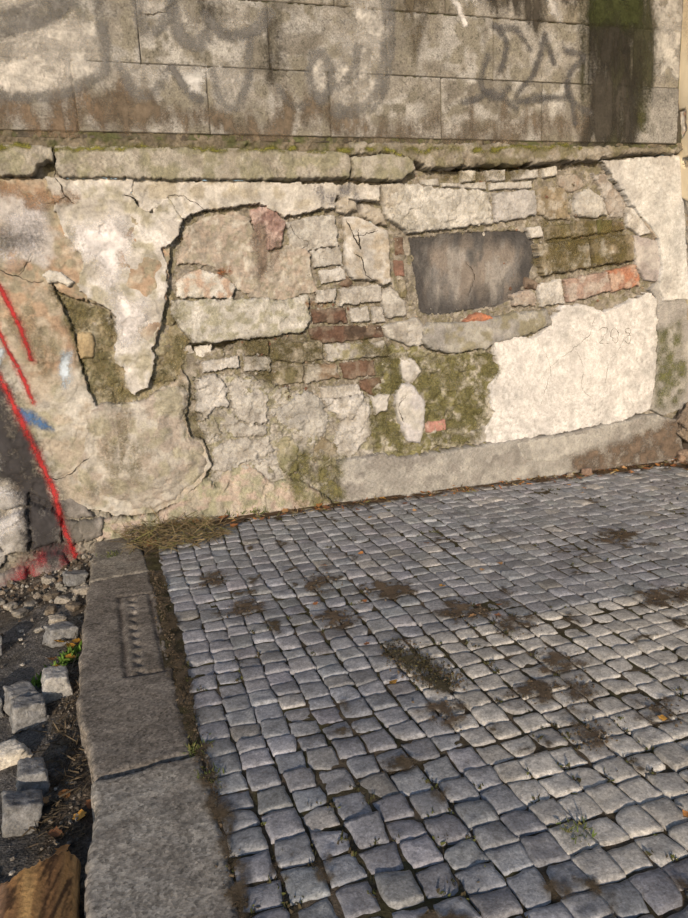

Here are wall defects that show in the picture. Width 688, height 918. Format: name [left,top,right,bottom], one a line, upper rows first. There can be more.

leakage [264,18,281,82]
leakage [400,0,428,56]
leakage [446,0,655,147]
leakage [0,78,439,144]
crack [46,148,73,204]
spalling [0,158,661,587]